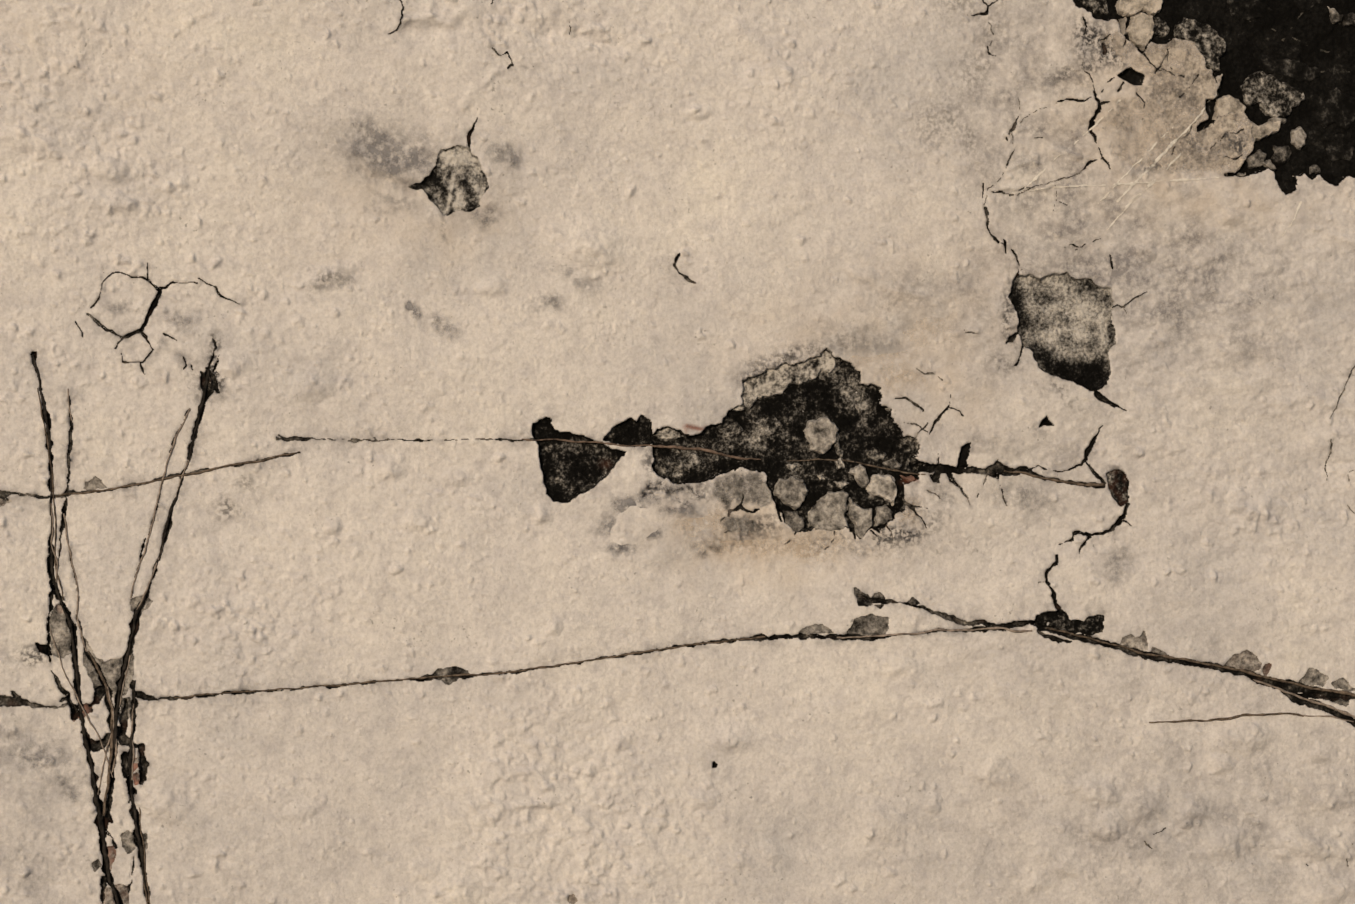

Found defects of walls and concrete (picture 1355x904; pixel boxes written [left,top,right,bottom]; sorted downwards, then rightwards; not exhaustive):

spalling [407,145,489,216]
crack [673,253,696,284]
spalling [1008,272,1116,391]
crack [971,0,1244,278]
spalling [1073,0,1355,195]
spalling [532,348,923,539]
crack [0,263,1355,904]